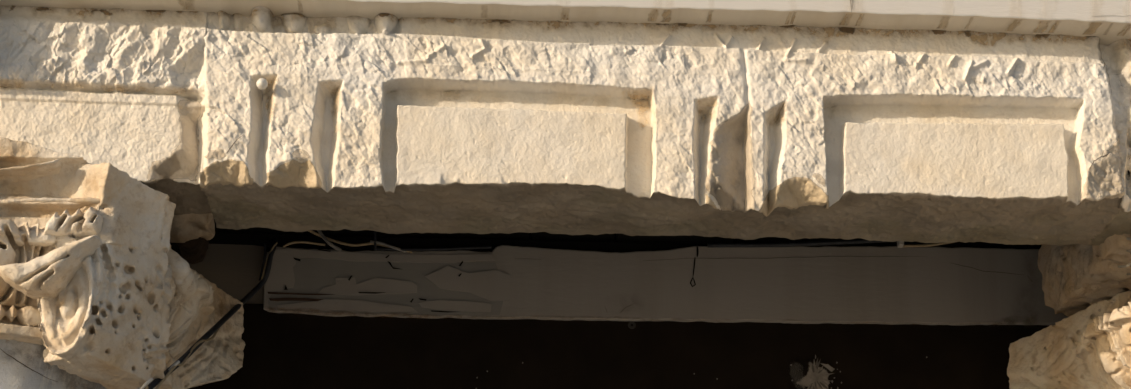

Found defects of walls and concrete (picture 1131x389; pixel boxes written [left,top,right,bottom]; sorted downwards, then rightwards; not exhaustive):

spalling [706,103,829,217]
spalling [1080,136,1131,202]
peeling [266,248,510,316]